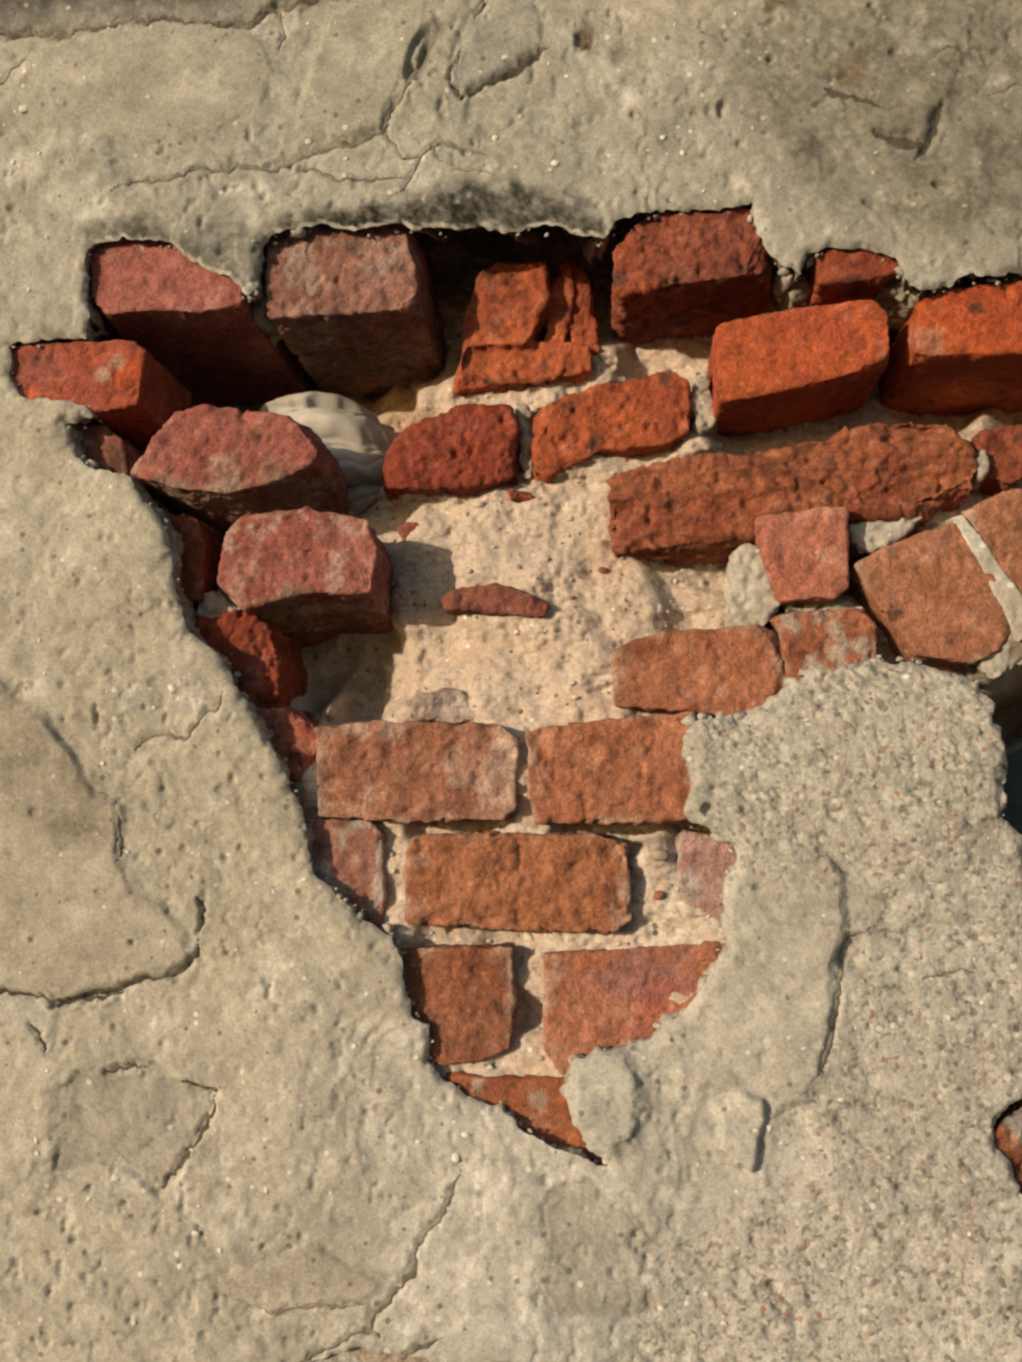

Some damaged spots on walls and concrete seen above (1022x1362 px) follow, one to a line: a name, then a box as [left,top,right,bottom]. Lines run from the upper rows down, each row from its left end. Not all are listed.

crack [0,0,319,85]
crack [110,31,551,196]
crack [823,87,943,160]
spalling [9,236,125,397]
spalling [67,406,365,919]
spalling [290,203,1022,1170]
peeling [0,685,190,1050]
crack [0,896,206,1055]
flaking render [52,1059,213,1193]
crack [158,1080,217,1190]
crack [244,1158,467,1362]
flaking render [538,1181,659,1318]